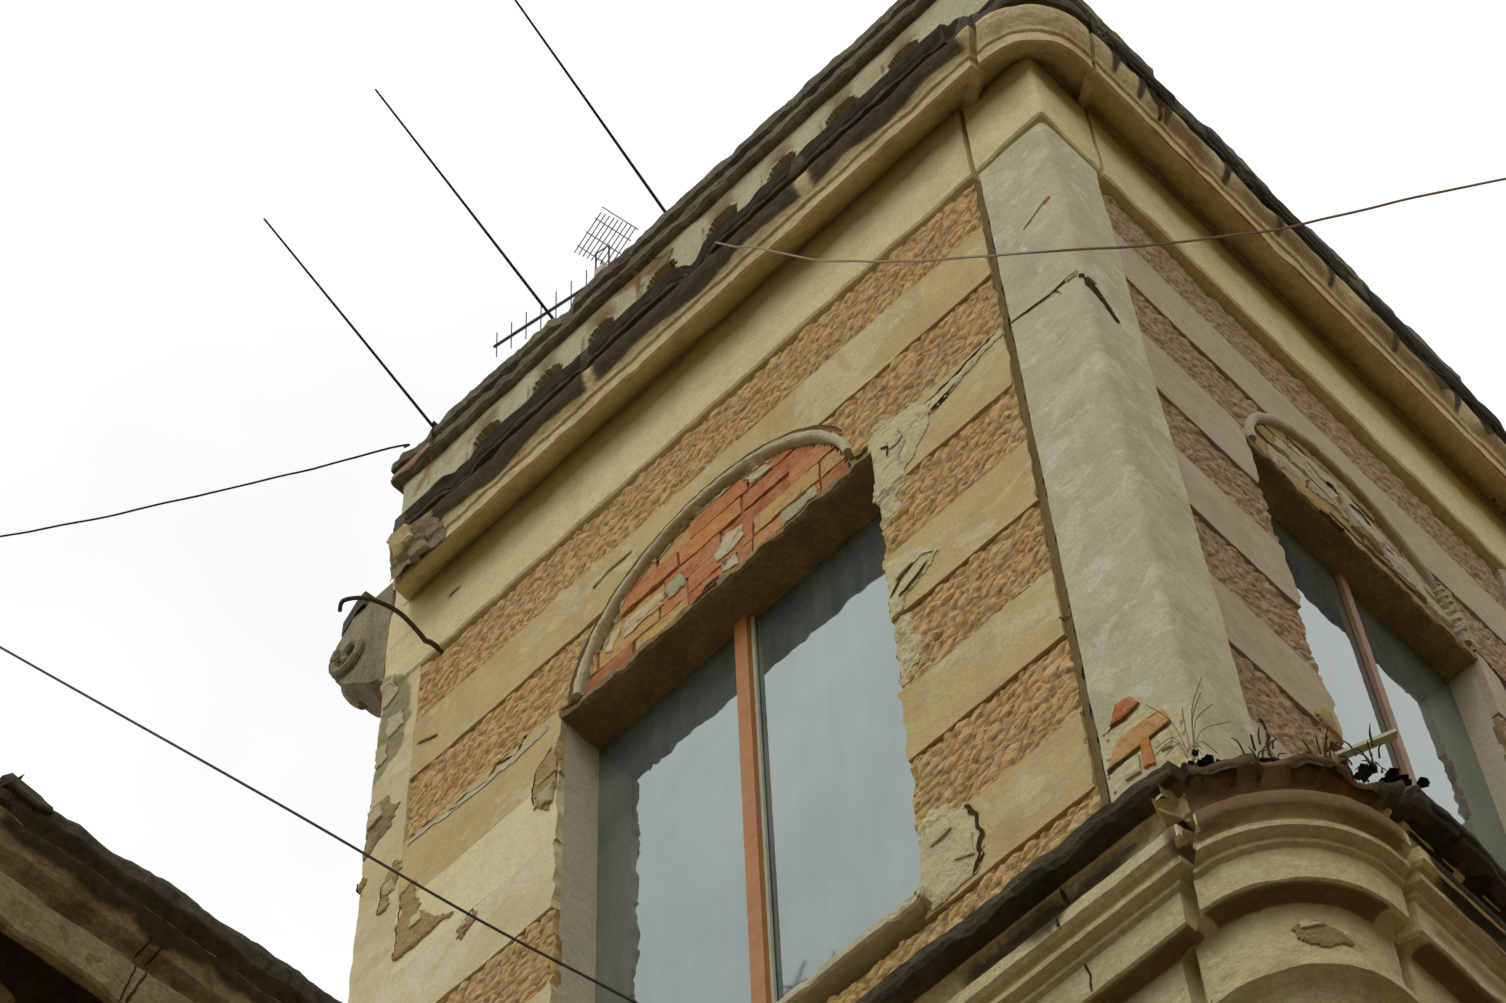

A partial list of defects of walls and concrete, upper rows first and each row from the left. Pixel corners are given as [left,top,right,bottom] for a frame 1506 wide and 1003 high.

damp [405,0,993,520]
peeling [605,629,621,653]
spalling [692,558,734,605]
spalling [884,546,939,688]
damp [0,800,311,1003]
flaking render [356,674,478,961]
peeling [925,817,975,861]
flaking render [1083,696,1192,853]